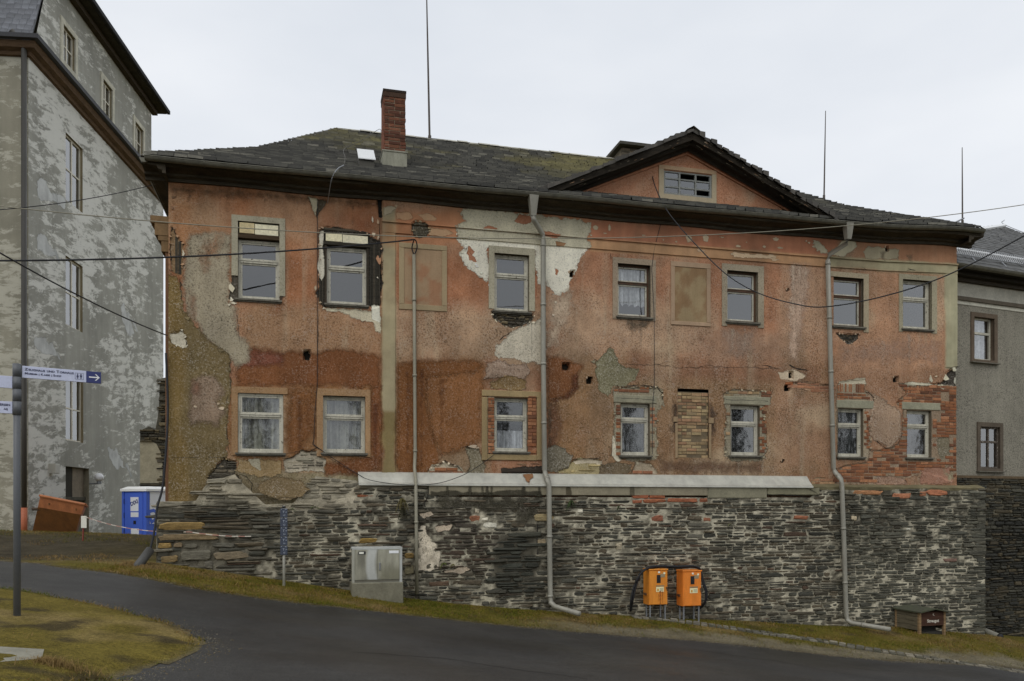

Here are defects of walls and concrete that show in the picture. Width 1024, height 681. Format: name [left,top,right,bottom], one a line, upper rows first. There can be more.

peeling [169,227,250,371]
peeling [309,197,611,364]
spalling [206,449,326,492]
spalling [428,461,465,473]
spalling [558,385,665,474]
spalling [723,366,959,485]